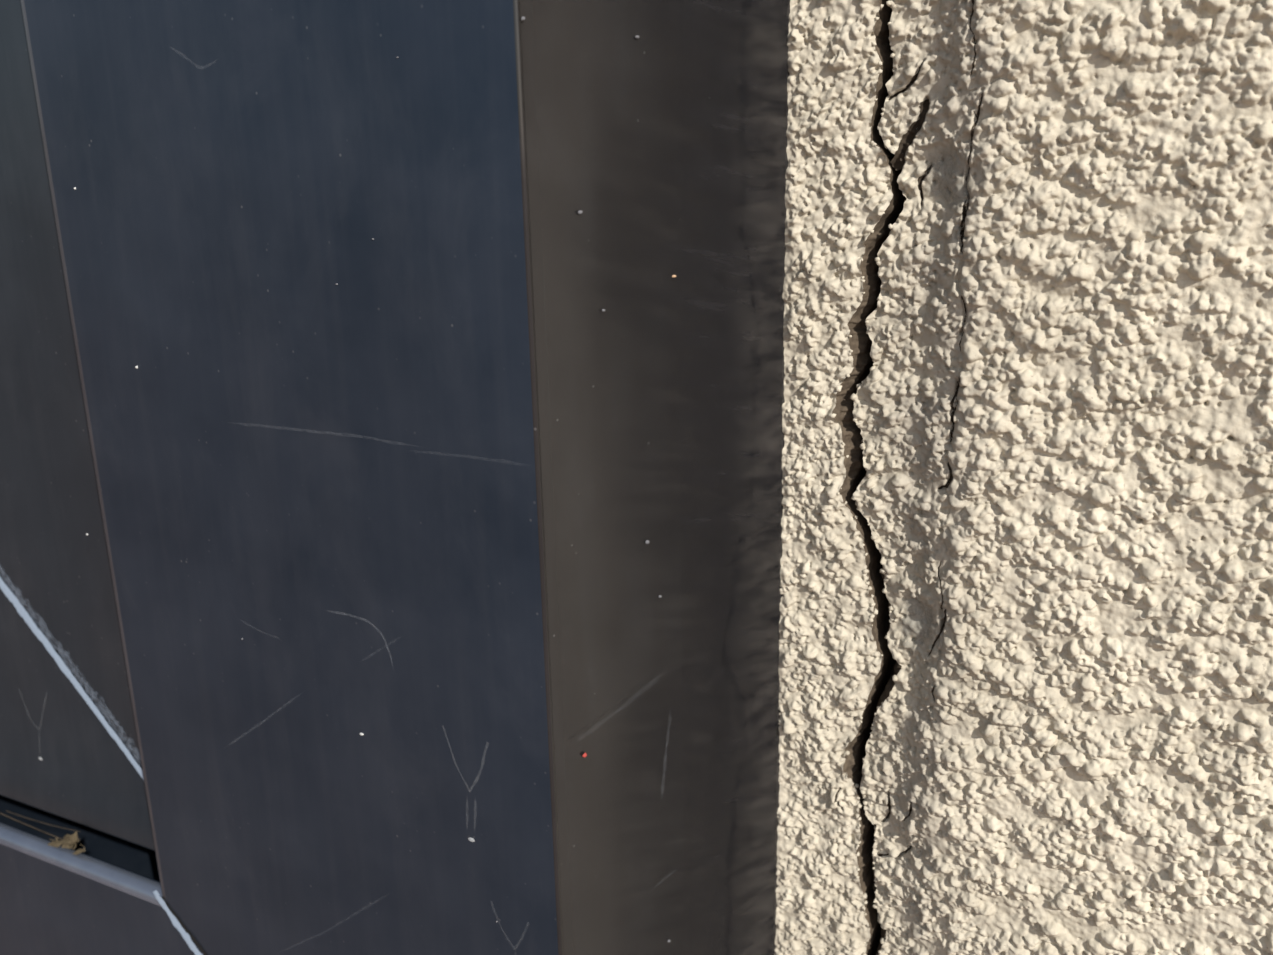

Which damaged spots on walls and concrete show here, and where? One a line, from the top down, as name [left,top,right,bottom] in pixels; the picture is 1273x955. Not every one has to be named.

crack [960,0,983,252]
crack [830,0,946,955]
crack [938,297,967,489]